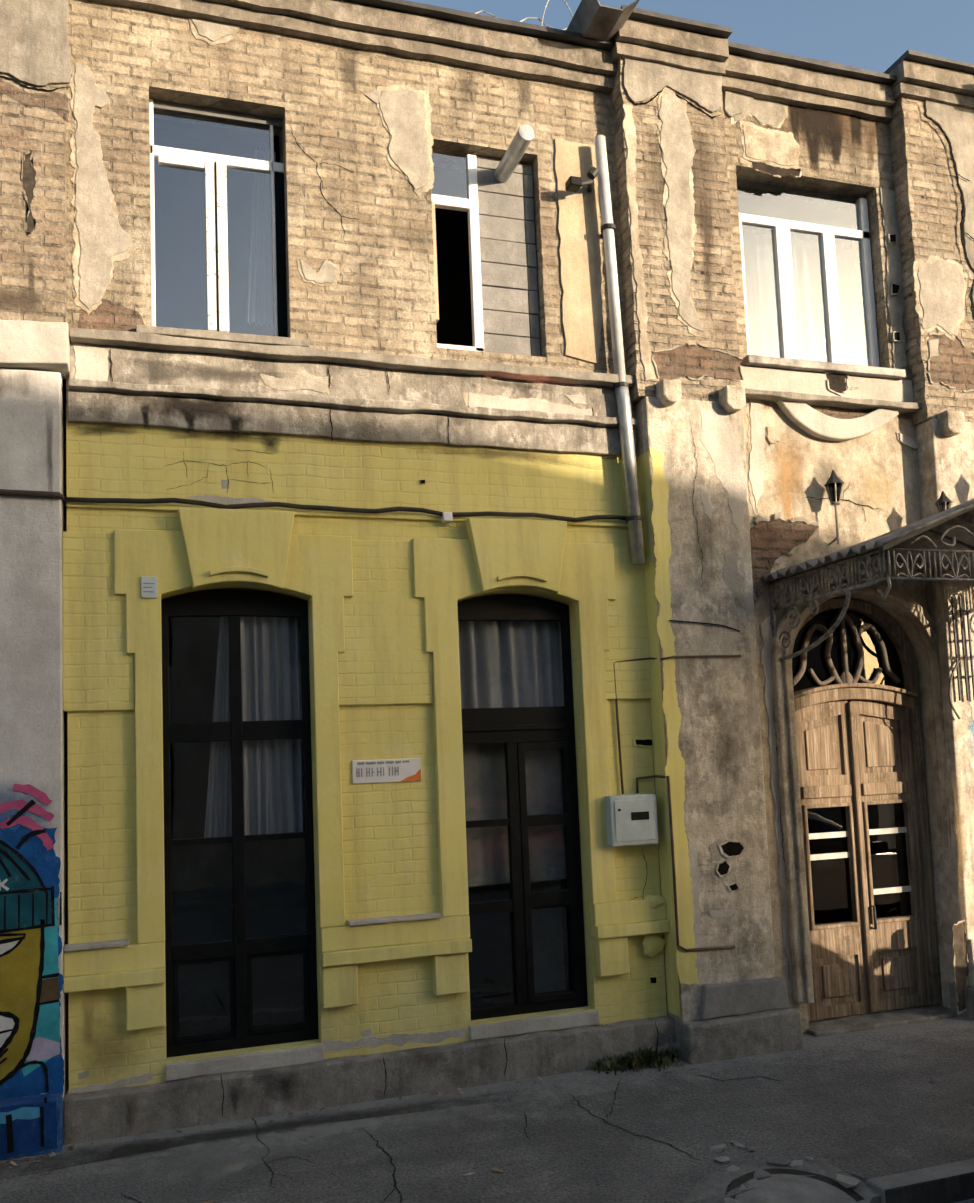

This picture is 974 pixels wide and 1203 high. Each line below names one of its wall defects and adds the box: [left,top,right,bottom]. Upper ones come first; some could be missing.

crack [0,76,69,92]
peeling [0,0,145,332]
damp [788,105,874,169]
peeling [622,58,802,381]
peeling [879,100,974,392]
crack [923,104,974,316]
peeling [73,343,108,381]
damp [151,365,258,379]
damp [142,396,276,449]
crack [166,449,273,493]
peeling [700,399,820,603]
peeling [323,1028,465,1052]